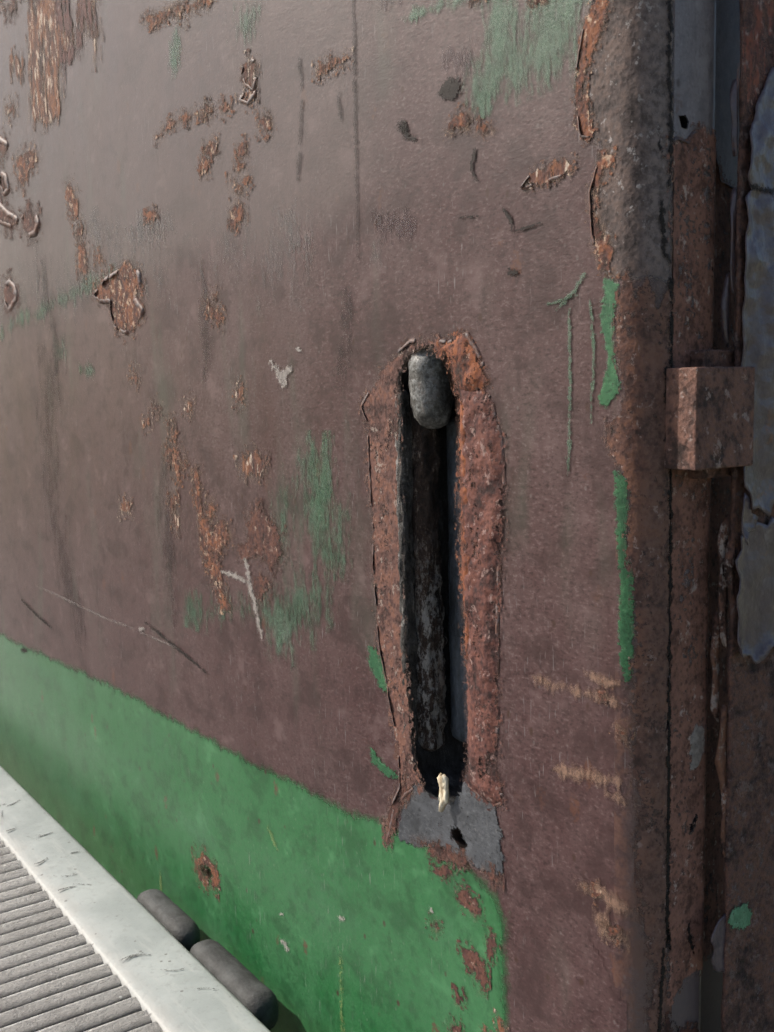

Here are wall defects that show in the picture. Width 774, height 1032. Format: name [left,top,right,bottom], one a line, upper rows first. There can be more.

corrosion [0,0,104,246]
corrosion [196,48,277,236]
peeling [519,151,579,197]
corrosion [126,359,288,617]
corrosion [356,324,509,851]
corrosion [556,0,752,1032]
corrosion [191,844,221,902]